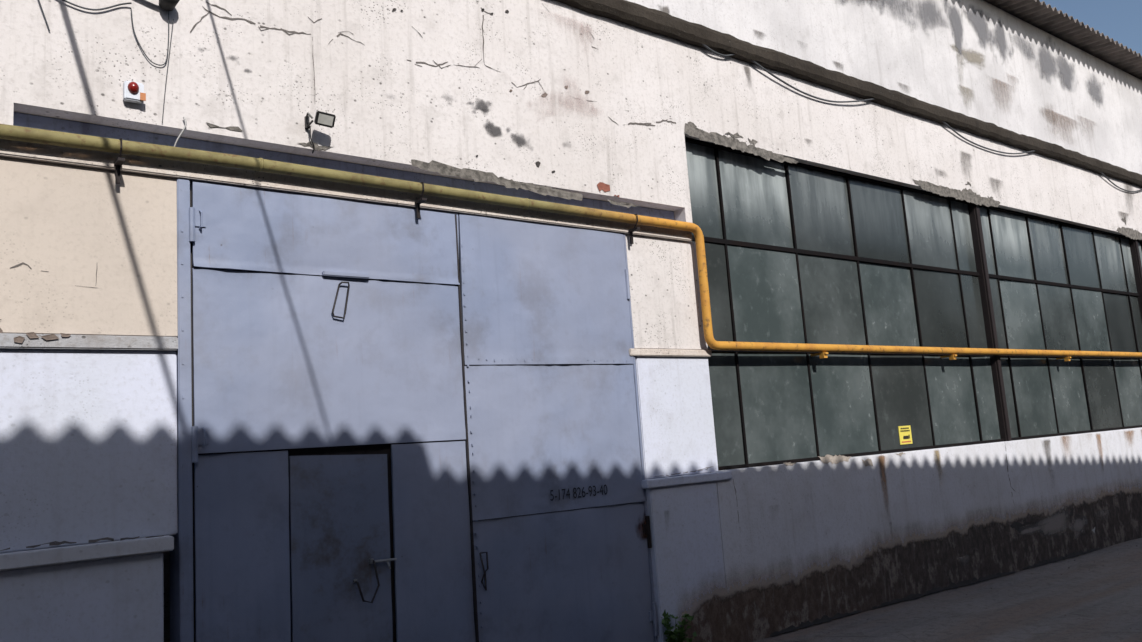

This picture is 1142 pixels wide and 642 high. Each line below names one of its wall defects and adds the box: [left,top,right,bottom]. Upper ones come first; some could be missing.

water stain [842,0,904,14]
crack [408,0,545,92]
water stain [919,0,1073,89]
water stain [1089,79,1103,103]
peeling [0,319,71,343]
corrosion [879,456,887,494]
water stain [680,486,1142,642]